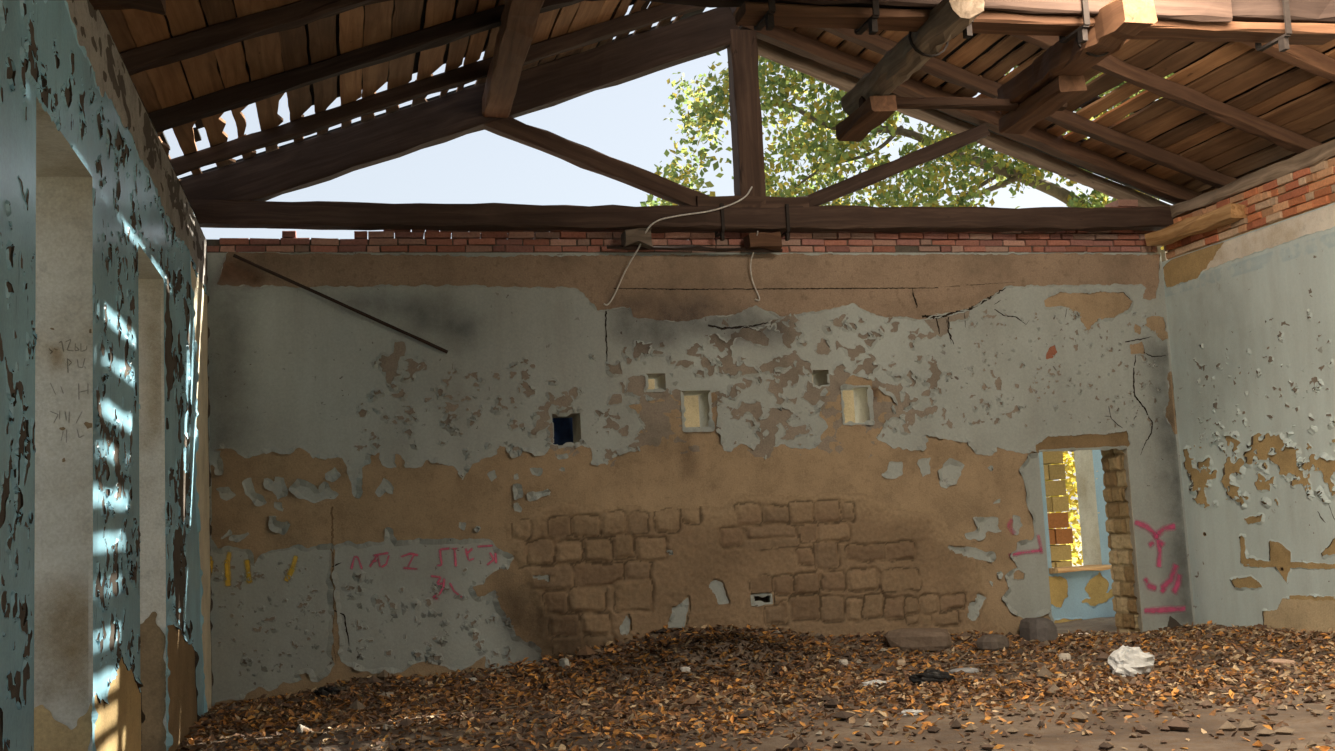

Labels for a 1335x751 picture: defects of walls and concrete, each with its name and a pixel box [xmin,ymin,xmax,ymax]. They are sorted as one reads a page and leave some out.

peeling [0,0,75,137]
peeling [92,100,131,214]
peeling [0,176,35,310]
peeling [97,160,155,348]
peeling [1043,288,1136,352]
peeling [0,317,37,710]
peeling [84,304,141,613]
peeling [356,339,429,451]
crack [1106,337,1166,453]
peeling [1183,308,1335,634]
peeling [1049,574,1069,609]
peeling [0,707,10,751]